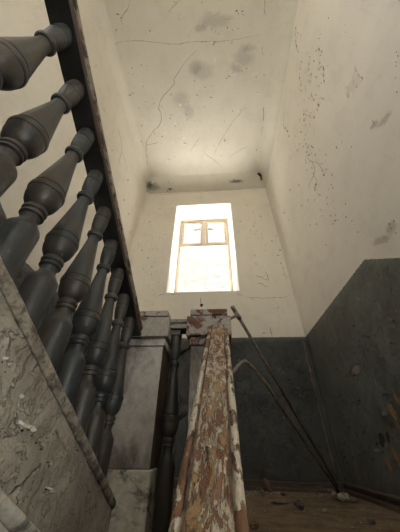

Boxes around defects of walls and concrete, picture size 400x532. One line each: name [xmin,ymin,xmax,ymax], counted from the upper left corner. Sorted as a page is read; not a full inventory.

crack [146,36,253,163]